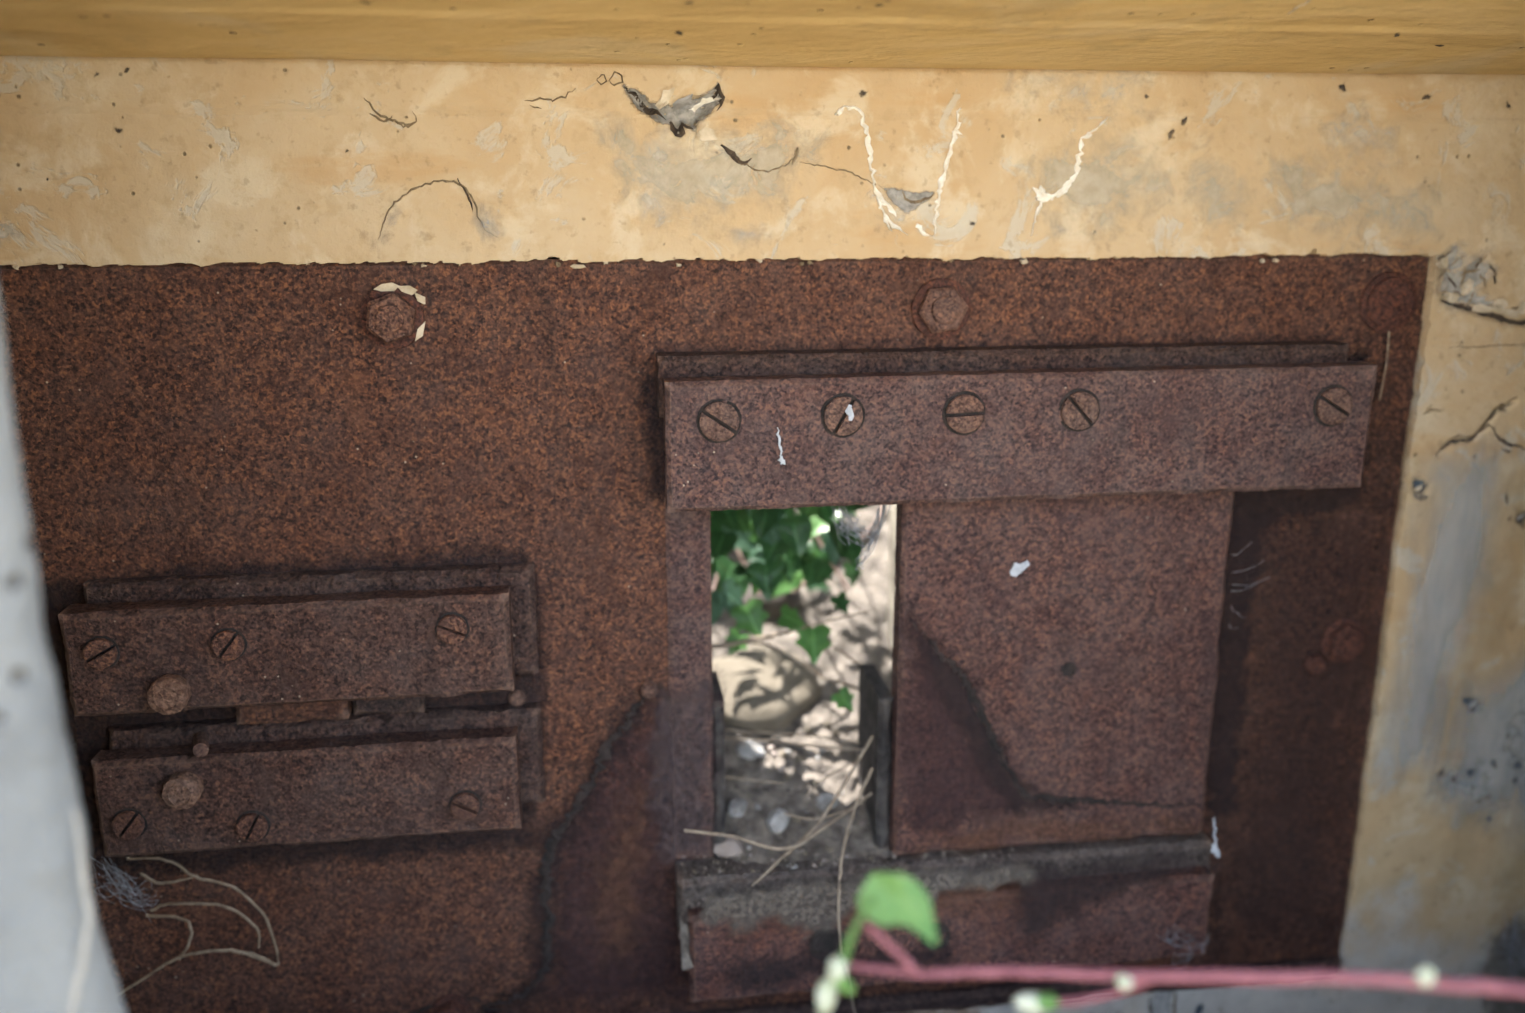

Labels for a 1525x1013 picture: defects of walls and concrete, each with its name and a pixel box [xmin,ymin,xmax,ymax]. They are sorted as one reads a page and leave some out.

crack [378,178,497,239]
peeling [615,82,788,220]
crack [720,144,881,187]
spalling [885,188,934,213]
spalling [1436,247,1525,315]
crack [1441,299,1525,349]
rust [640,377,665,497]
crack [1424,403,1525,454]
rust [1206,483,1364,815]
water stain [1401,467,1482,760]
water stain [1458,675,1525,801]
rust [40,584,711,1013]